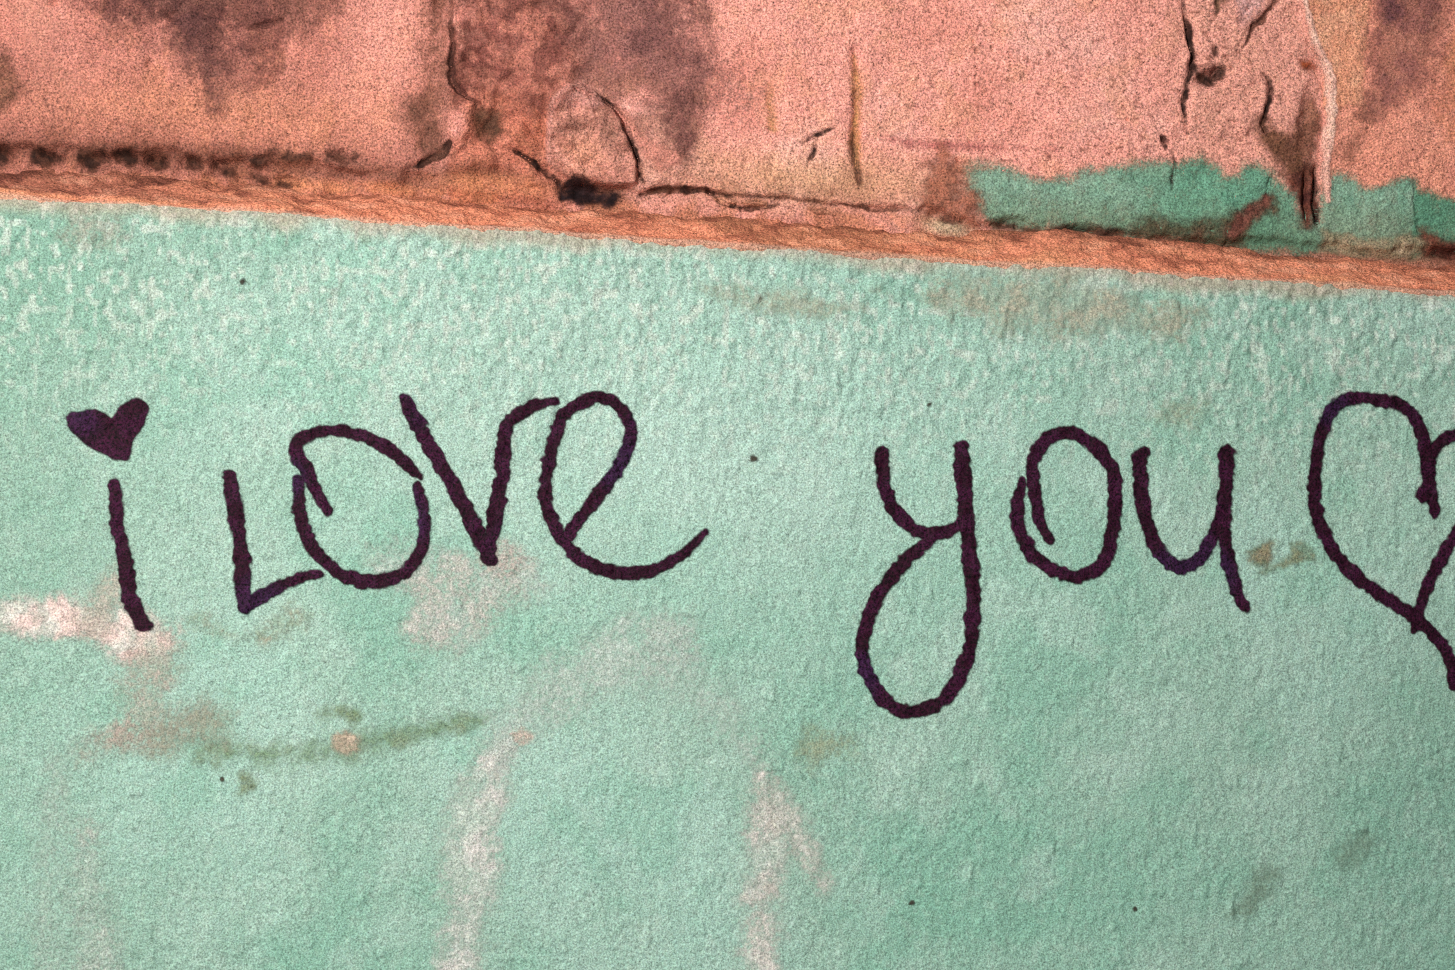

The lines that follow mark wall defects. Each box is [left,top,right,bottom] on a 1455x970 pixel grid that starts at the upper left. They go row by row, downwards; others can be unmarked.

leakage [158,0,231,112]
crack [415,139,452,168]
crack [446,20,473,101]
leakage [473,108,503,144]
crack [513,150,561,185]
leakage [562,81,700,165]
crack [574,85,891,215]
crack [1160,0,1278,184]
crack [1311,175,1319,225]
peeling [1320,231,1425,258]